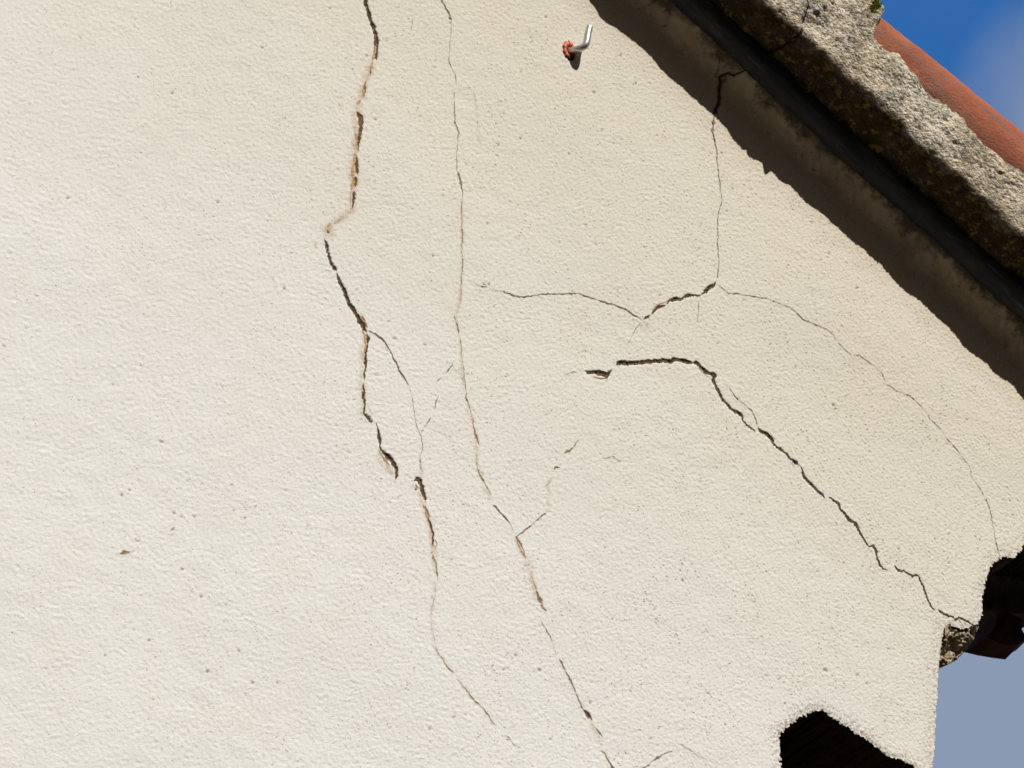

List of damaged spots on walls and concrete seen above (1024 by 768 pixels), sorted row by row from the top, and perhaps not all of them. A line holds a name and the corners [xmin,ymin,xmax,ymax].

crack [325,0,999,768]
spalling [939,623,979,669]
spalling [778,709,914,768]